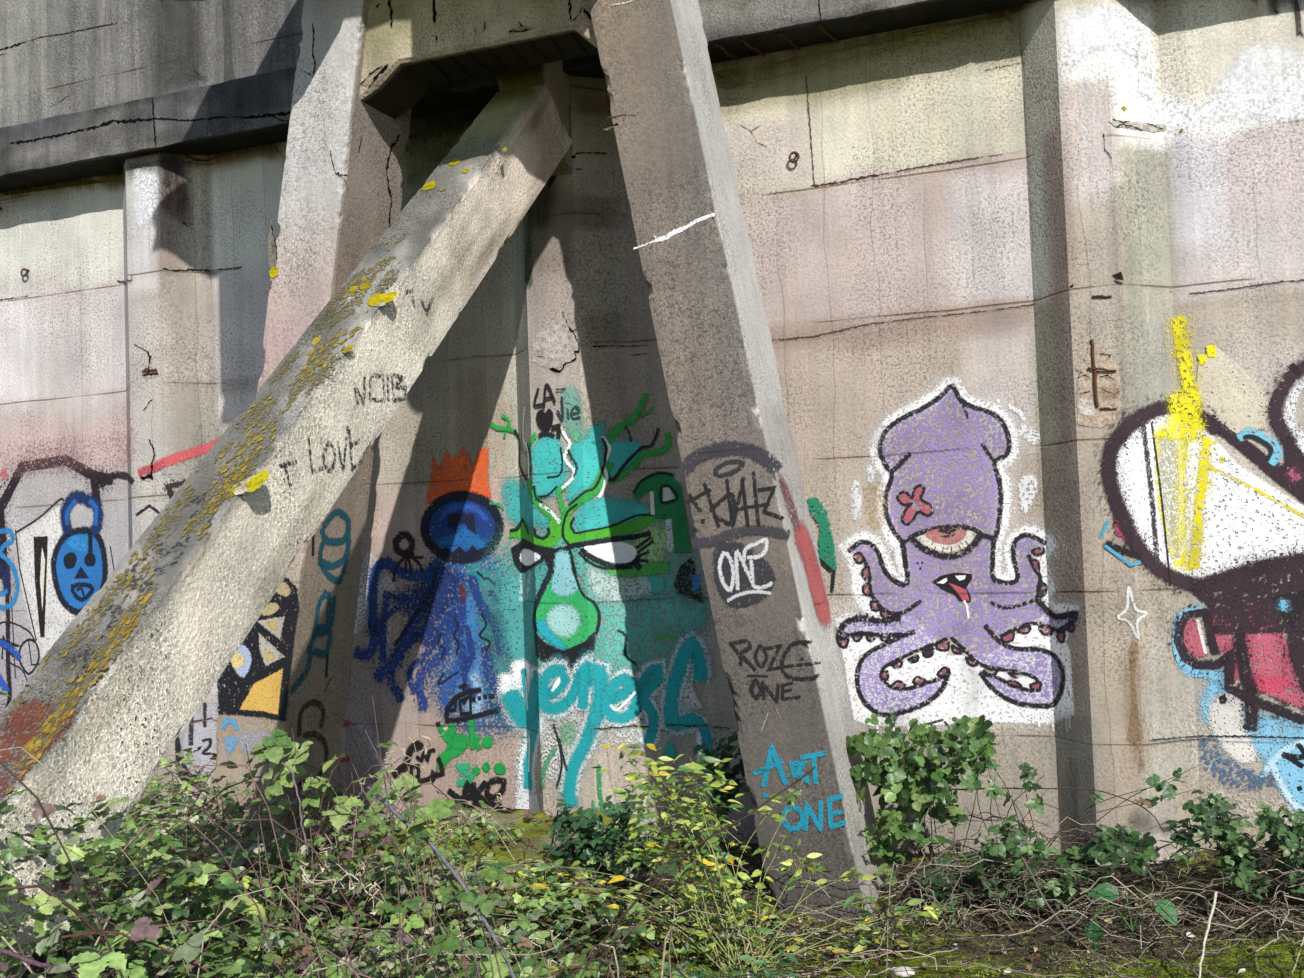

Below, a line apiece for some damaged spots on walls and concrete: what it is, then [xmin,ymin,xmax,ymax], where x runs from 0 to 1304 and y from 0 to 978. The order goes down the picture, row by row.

spalling [532,313,579,369]
spalling [1077,339,1122,428]